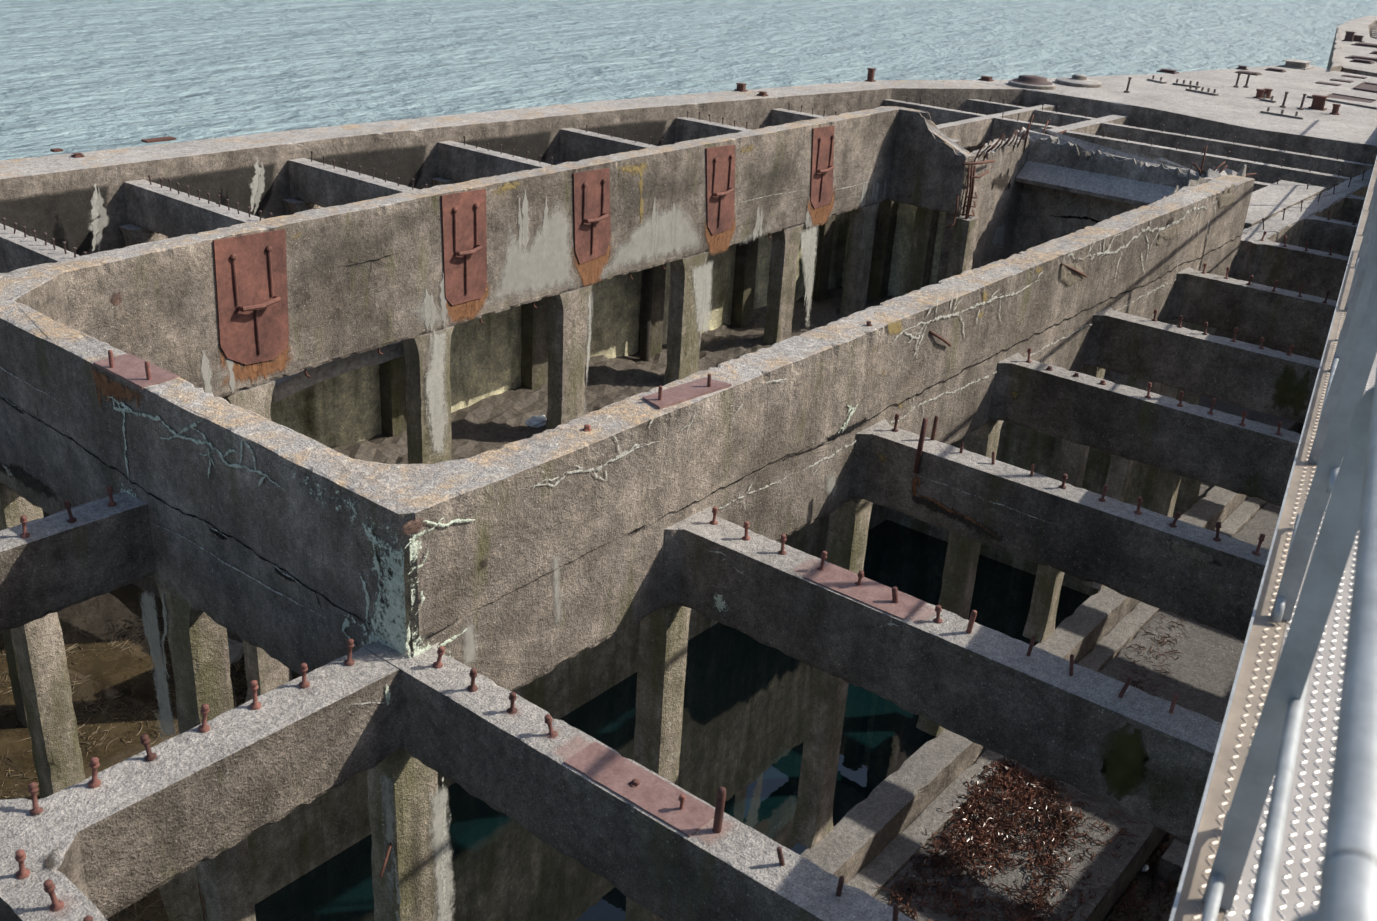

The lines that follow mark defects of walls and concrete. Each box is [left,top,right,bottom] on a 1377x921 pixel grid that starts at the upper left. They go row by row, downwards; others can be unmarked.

rust [705,217,736,255]
rust [573,242,611,286]
rust [446,285,489,322]
rust [221,346,290,383]
crack [463,182,1252,615]
crack [0,367,376,627]